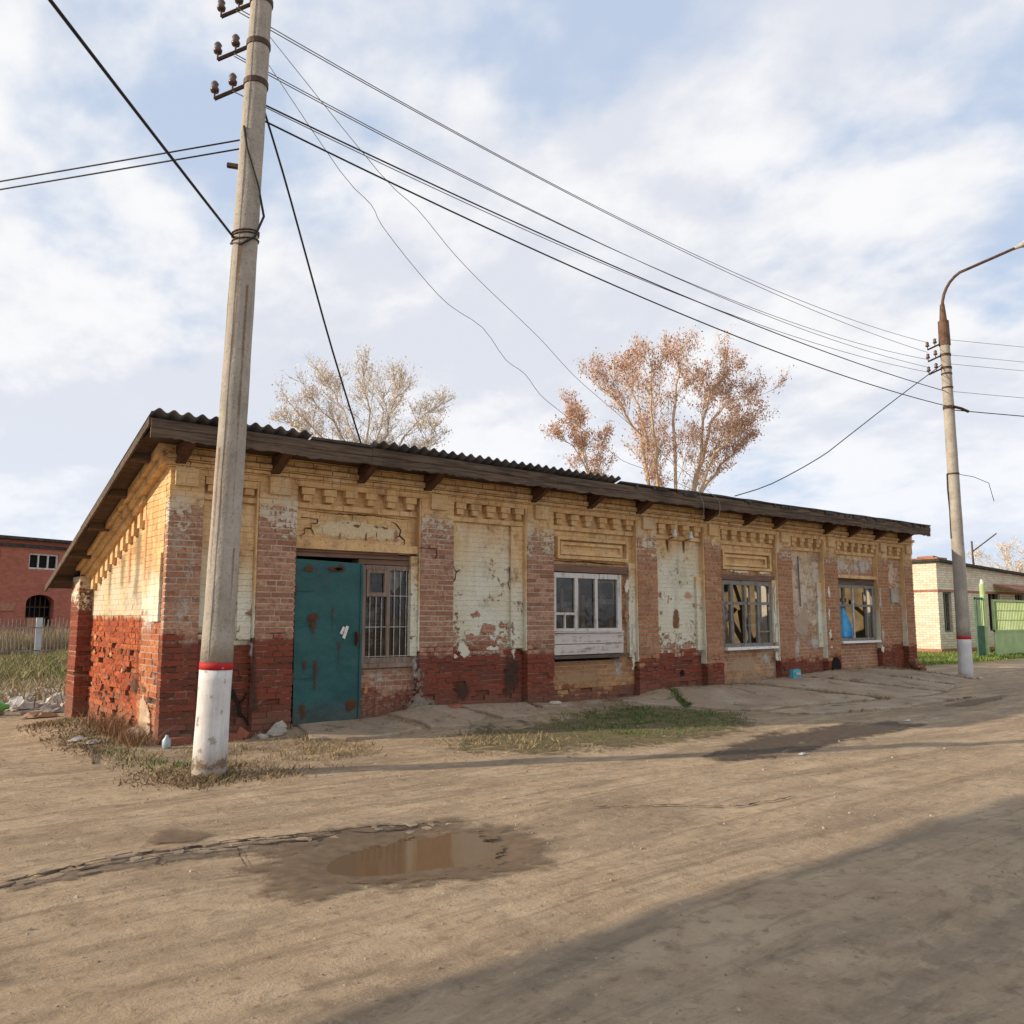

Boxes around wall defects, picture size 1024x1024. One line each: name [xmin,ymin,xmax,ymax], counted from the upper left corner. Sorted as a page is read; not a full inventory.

peeling [313,518,403,542]
crack [301,510,461,581]
peeling [454,611,516,659]
peeling [658,609,694,656]
peeling [794,587,833,657]
spalling [91,652,151,735]